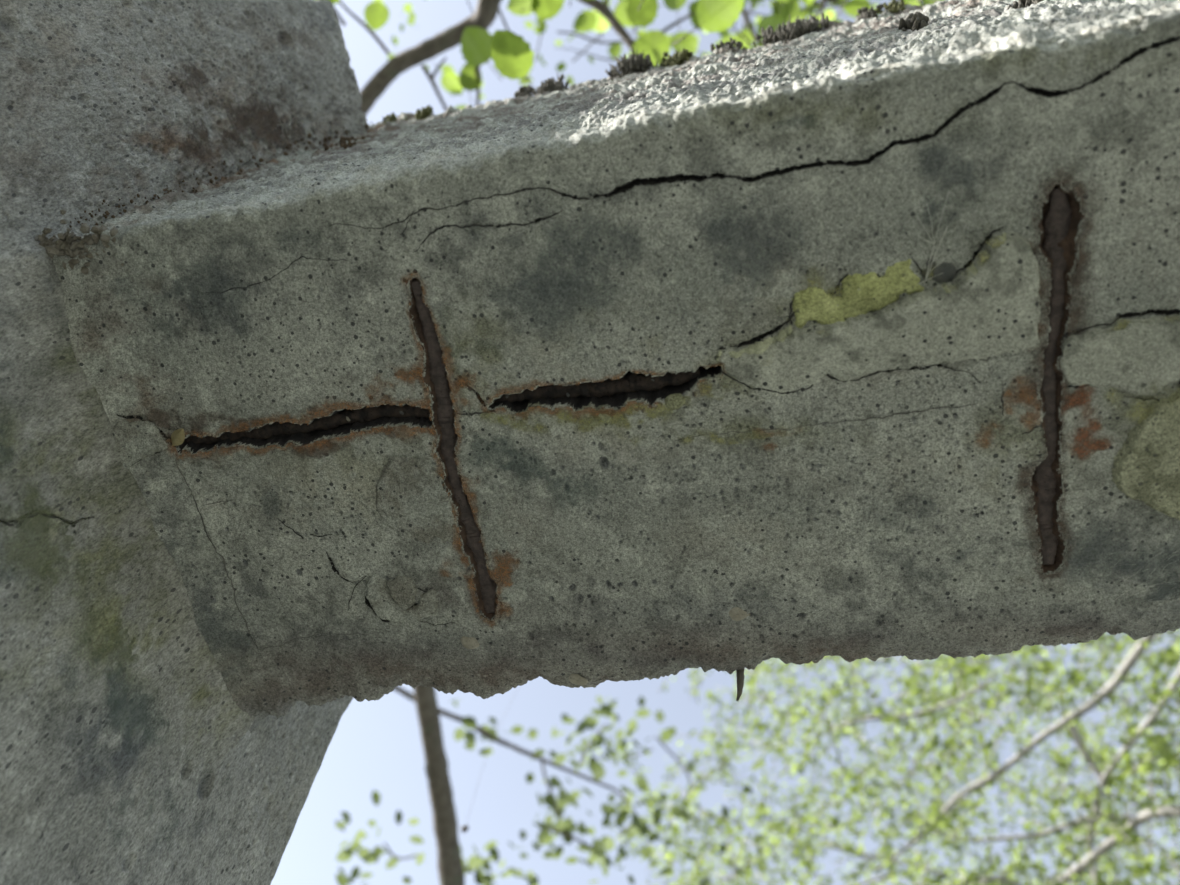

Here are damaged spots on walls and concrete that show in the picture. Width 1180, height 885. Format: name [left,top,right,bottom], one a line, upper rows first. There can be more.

crack [328,37,1180,253]
crack [956,227,1003,274]
crack [830,274,848,296]
crack [1060,309,1180,340]
crack [454,378,495,415]
rust [483,364,724,418]
rust [1004,187,1110,586]
rust [145,272,518,627]
crack [0,512,86,534]